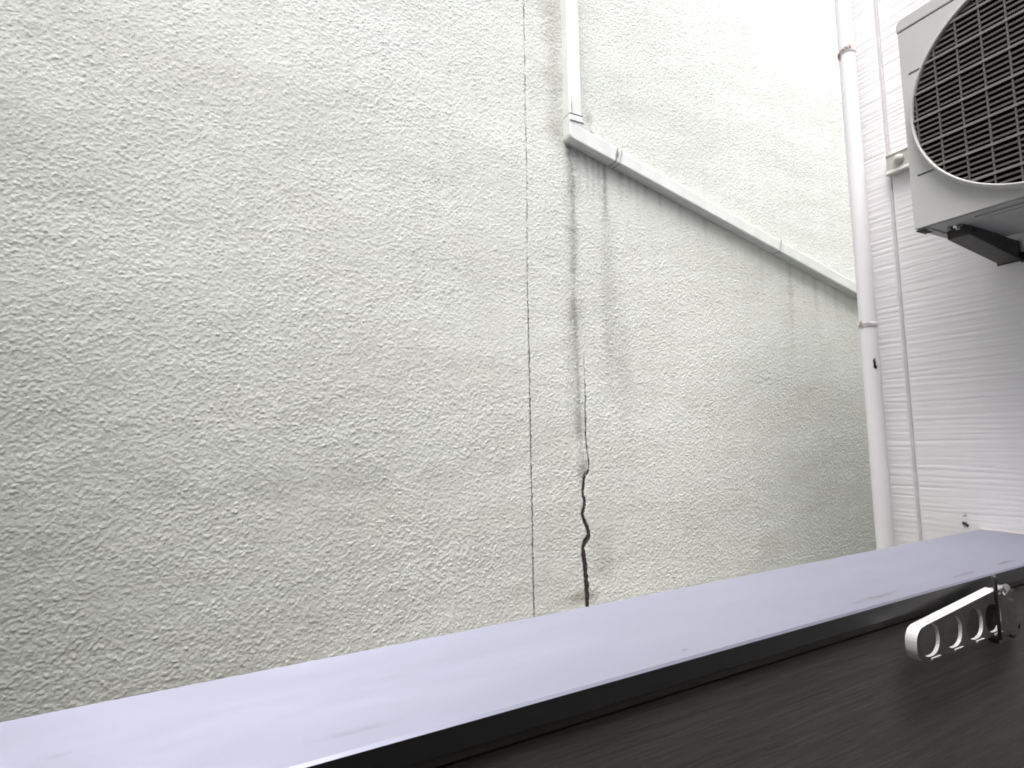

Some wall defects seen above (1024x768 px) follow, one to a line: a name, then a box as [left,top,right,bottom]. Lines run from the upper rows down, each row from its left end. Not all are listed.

crack [581,383,590,607]